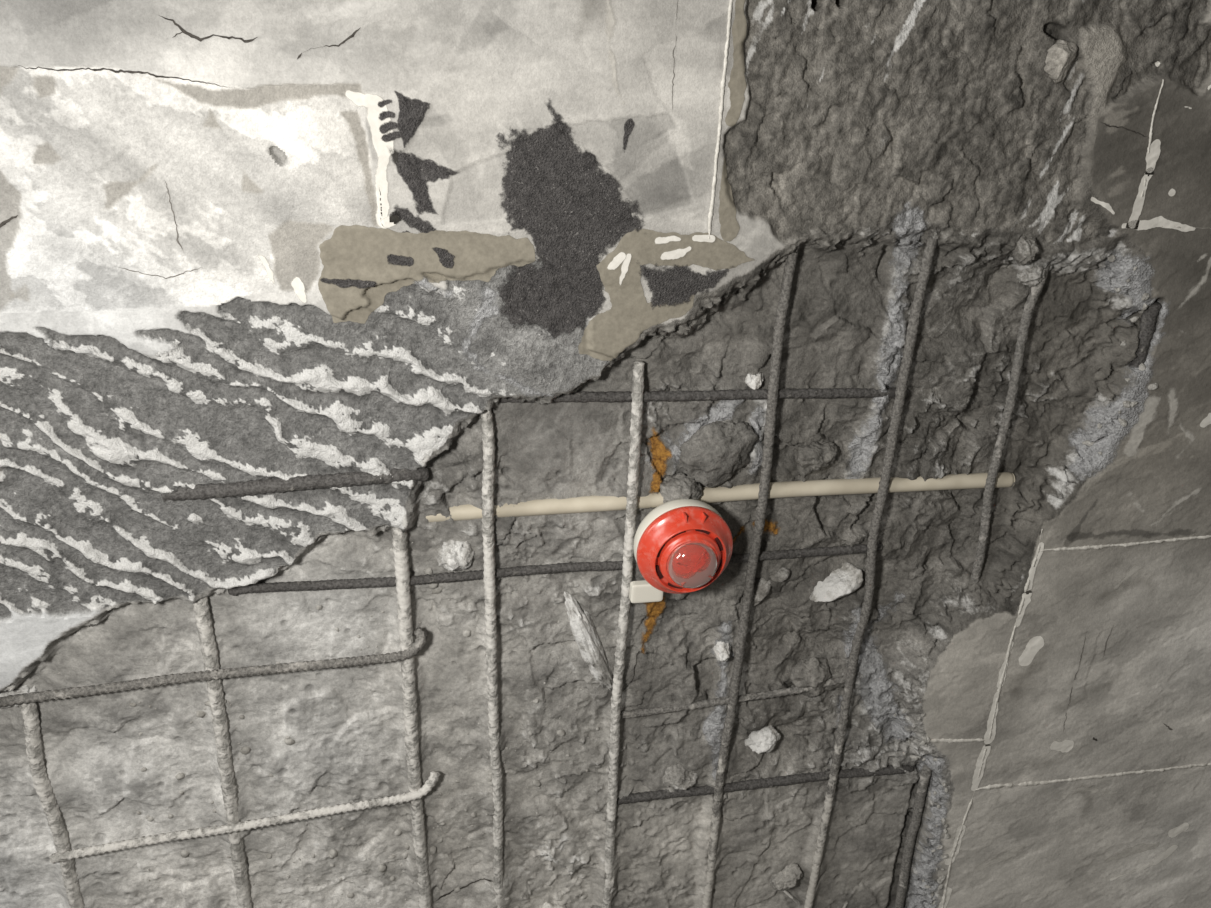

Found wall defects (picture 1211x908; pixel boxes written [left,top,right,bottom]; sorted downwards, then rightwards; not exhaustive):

crack [158,15,257,43]
crack [297,27,361,59]
spalling [1044,40,1078,84]
corrosion [649,431,671,492]
spalling [0,218,1166,908]
corrosion [642,597,665,652]
crack [1063,625,1114,731]